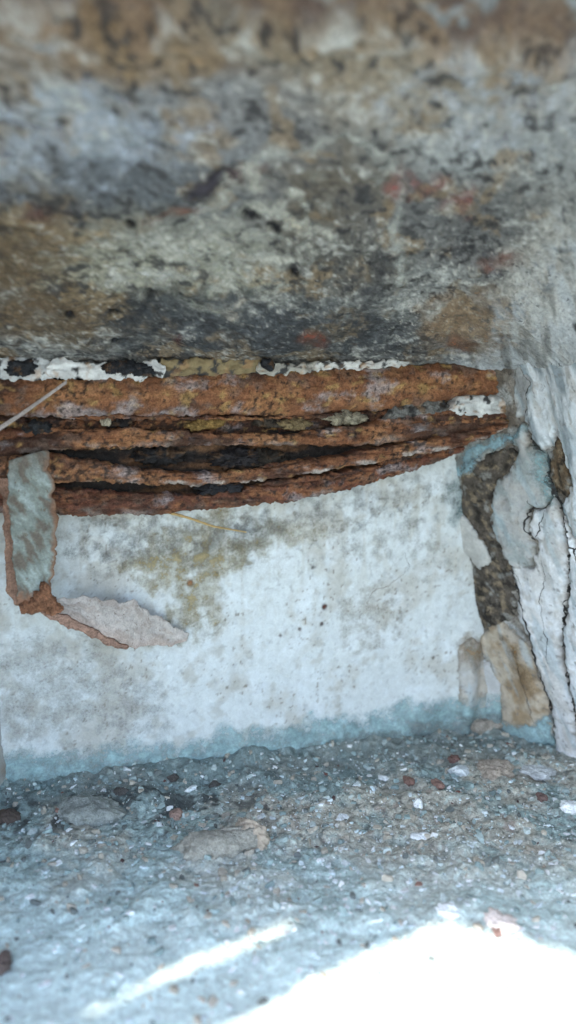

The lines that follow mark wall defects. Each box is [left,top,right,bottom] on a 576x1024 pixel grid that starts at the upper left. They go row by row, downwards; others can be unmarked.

leakage [114,168,405,358]
corrosion [0,362,509,606]
spalling [459,367,573,738]
crack [506,370,576,743]